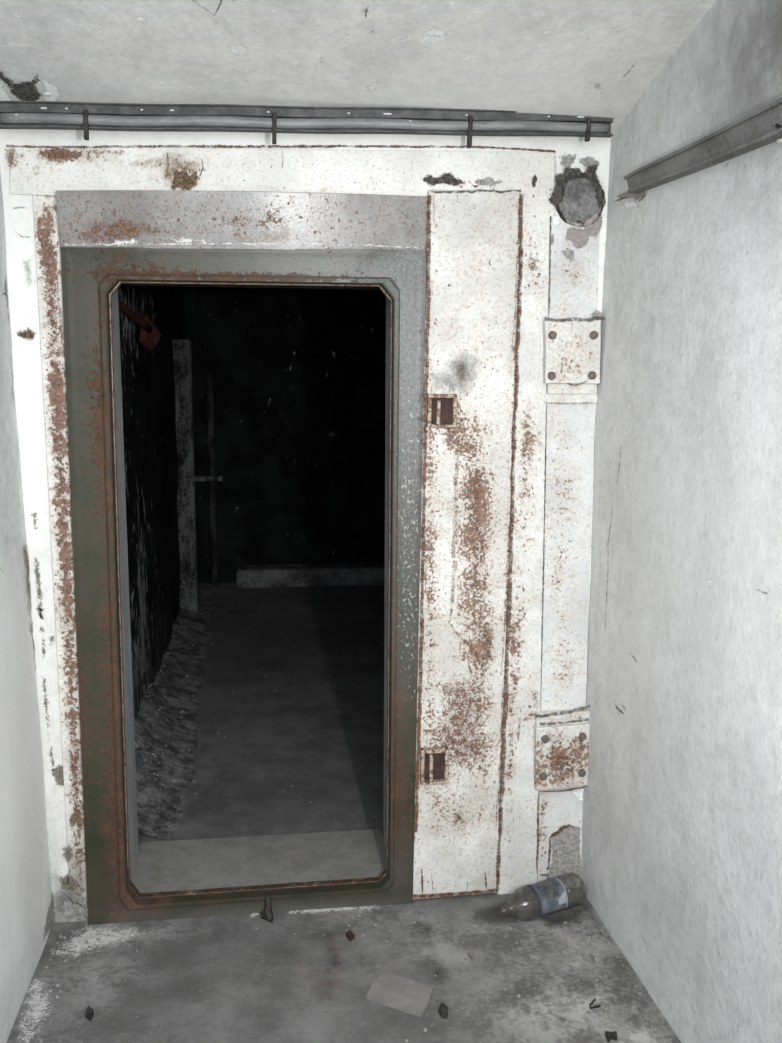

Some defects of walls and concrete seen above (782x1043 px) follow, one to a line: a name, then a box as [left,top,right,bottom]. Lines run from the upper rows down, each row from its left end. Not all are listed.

flaking render [0,71,62,101]
rust [5,144,556,175]
flaking render [549,153,646,260]
rust [35,216,83,865]
rust [413,189,535,898]
rust [533,433,547,699]
spalling [541,824,582,880]